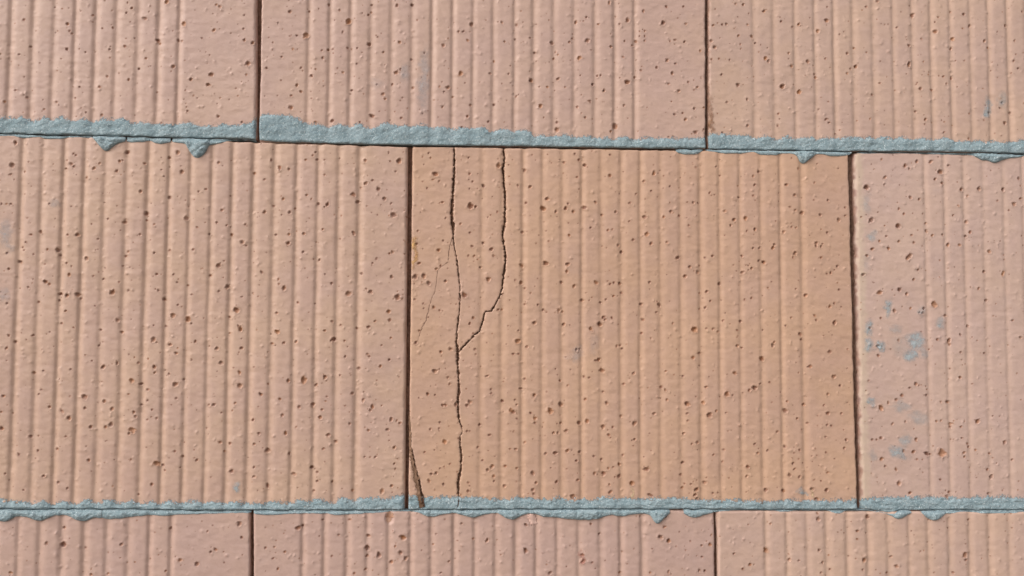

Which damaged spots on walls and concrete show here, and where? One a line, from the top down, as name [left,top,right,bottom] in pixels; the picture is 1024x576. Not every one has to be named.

crack [408,412,425,508]
crack [419,147,507,508]